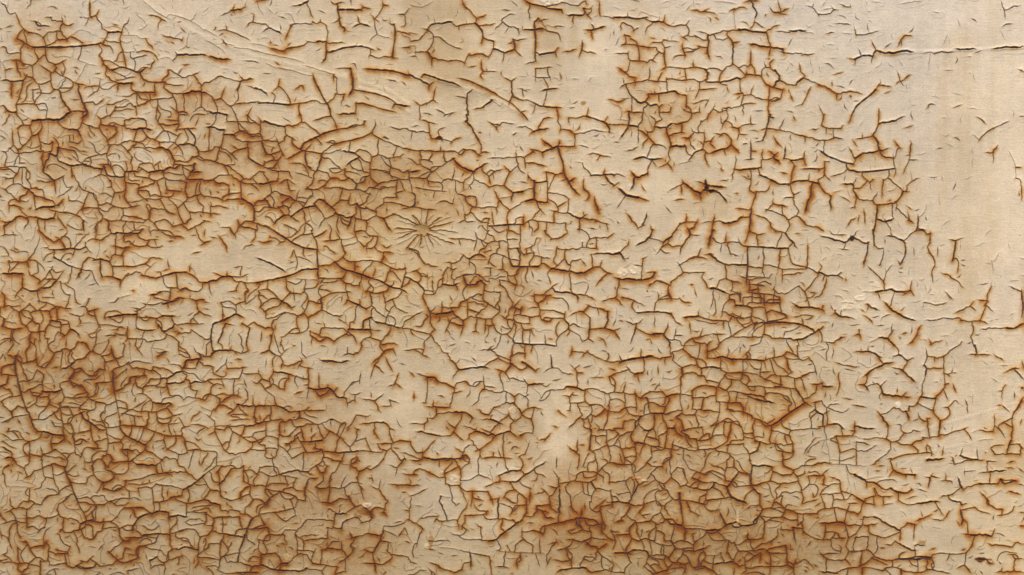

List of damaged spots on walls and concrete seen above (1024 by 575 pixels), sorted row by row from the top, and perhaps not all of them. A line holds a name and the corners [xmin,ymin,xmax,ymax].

crack [0,516,68,575]
crack [63,516,261,575]
crack [203,497,295,572]
crack [258,475,332,535]
crack [252,502,377,575]
crack [334,521,397,570]
crack [354,515,501,575]
crack [637,484,707,554]
crack [550,494,967,575]
crack [759,467,823,520]
crack [799,467,868,558]
rust [974,556,996,566]